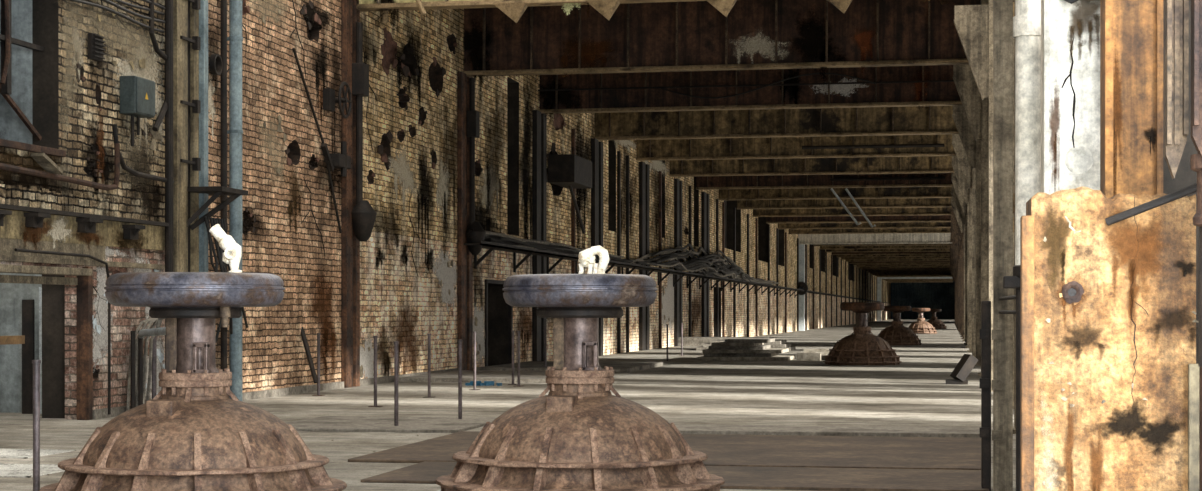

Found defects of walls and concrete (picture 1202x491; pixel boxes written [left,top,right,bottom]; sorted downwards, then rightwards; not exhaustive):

spalling [300,0,322,42]
leakage [736,34,787,64]
leakage [396,57,422,112]
crack [1061,34,1076,148]
leakage [376,152,455,282]